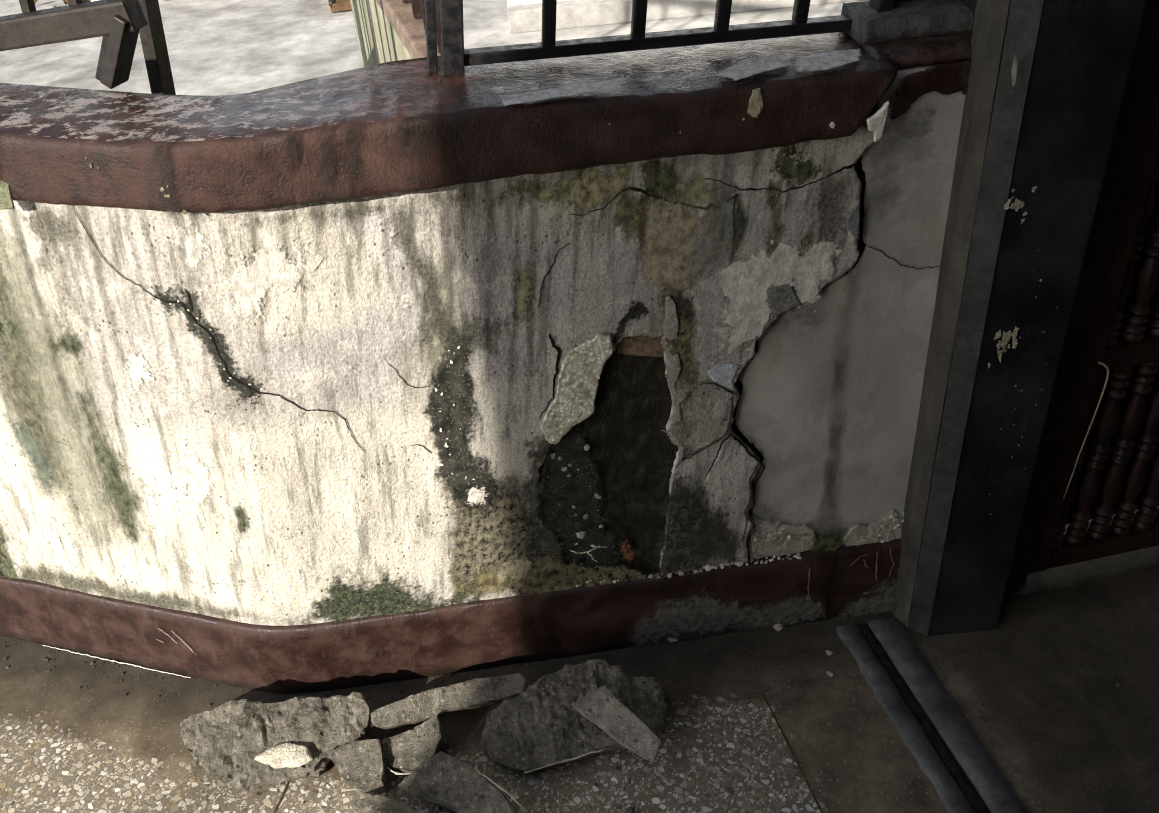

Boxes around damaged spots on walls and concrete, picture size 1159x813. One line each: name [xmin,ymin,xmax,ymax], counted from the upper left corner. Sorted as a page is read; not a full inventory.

peeling [747,88,763,119]
leakage [1,366,55,463]
leakage [48,330,82,356]
crack [73,205,366,454]
leakage [422,327,543,588]
crack [538,243,571,420]
spalling [499,295,815,596]
leakage [639,189,735,321]
crack [731,340,766,566]
crack [570,156,941,290]
peeling [718,240,842,354]
peeling [988,326,1019,369]